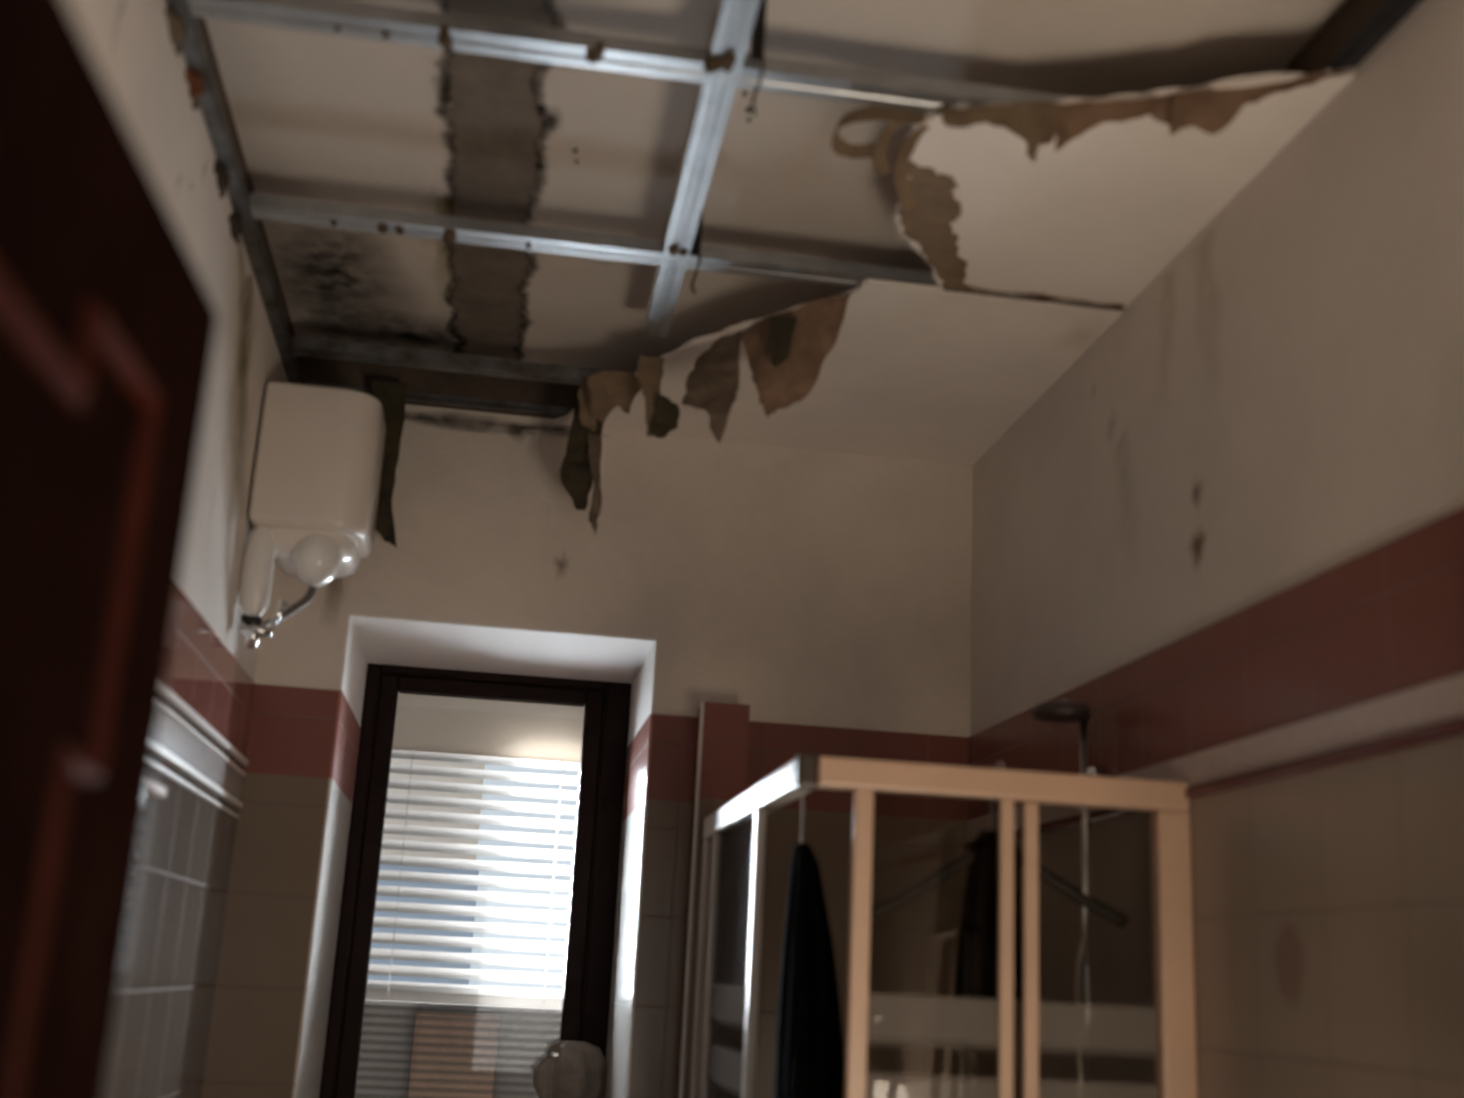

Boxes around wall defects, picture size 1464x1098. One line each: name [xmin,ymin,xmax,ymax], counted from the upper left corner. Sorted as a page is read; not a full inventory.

peeling [441,0,564,29]
spalling [165,7,204,110]
peeling [437,50,556,225]
spalling [213,159,243,244]
water stain [285,238,381,307]
water stain [362,326,468,352]
peeling [445,242,537,360]